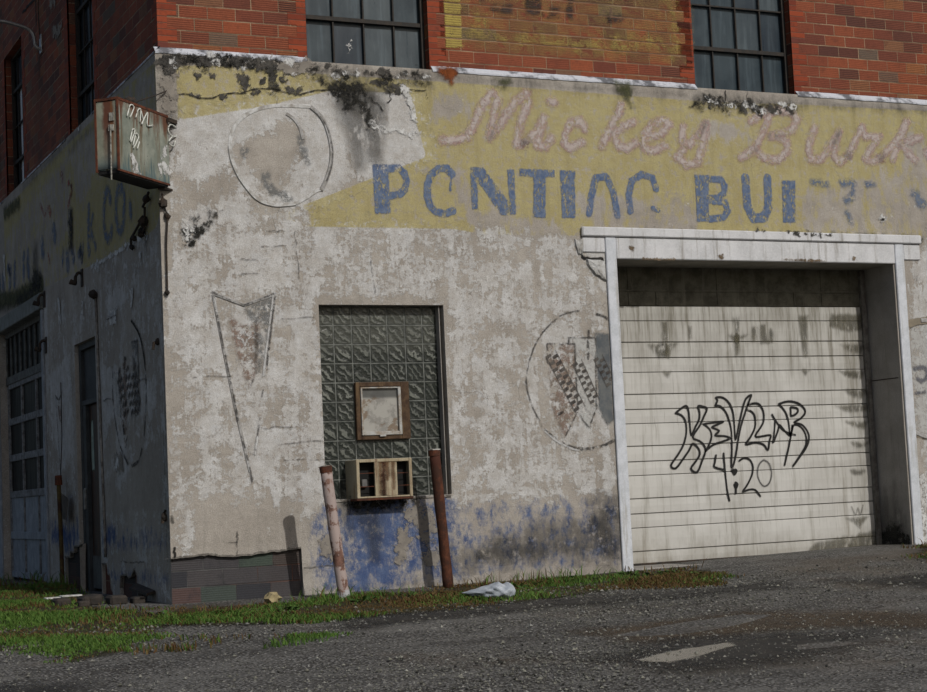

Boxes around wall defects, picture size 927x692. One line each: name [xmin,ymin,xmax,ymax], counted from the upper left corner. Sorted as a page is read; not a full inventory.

leakage [310,64,373,130]
leakage [381,80,406,95]
leakage [0,267,43,308]
leakage [652,322,672,356]
leakage [831,315,862,331]
leakage [811,525,910,551]
spalling [102,563,147,600]